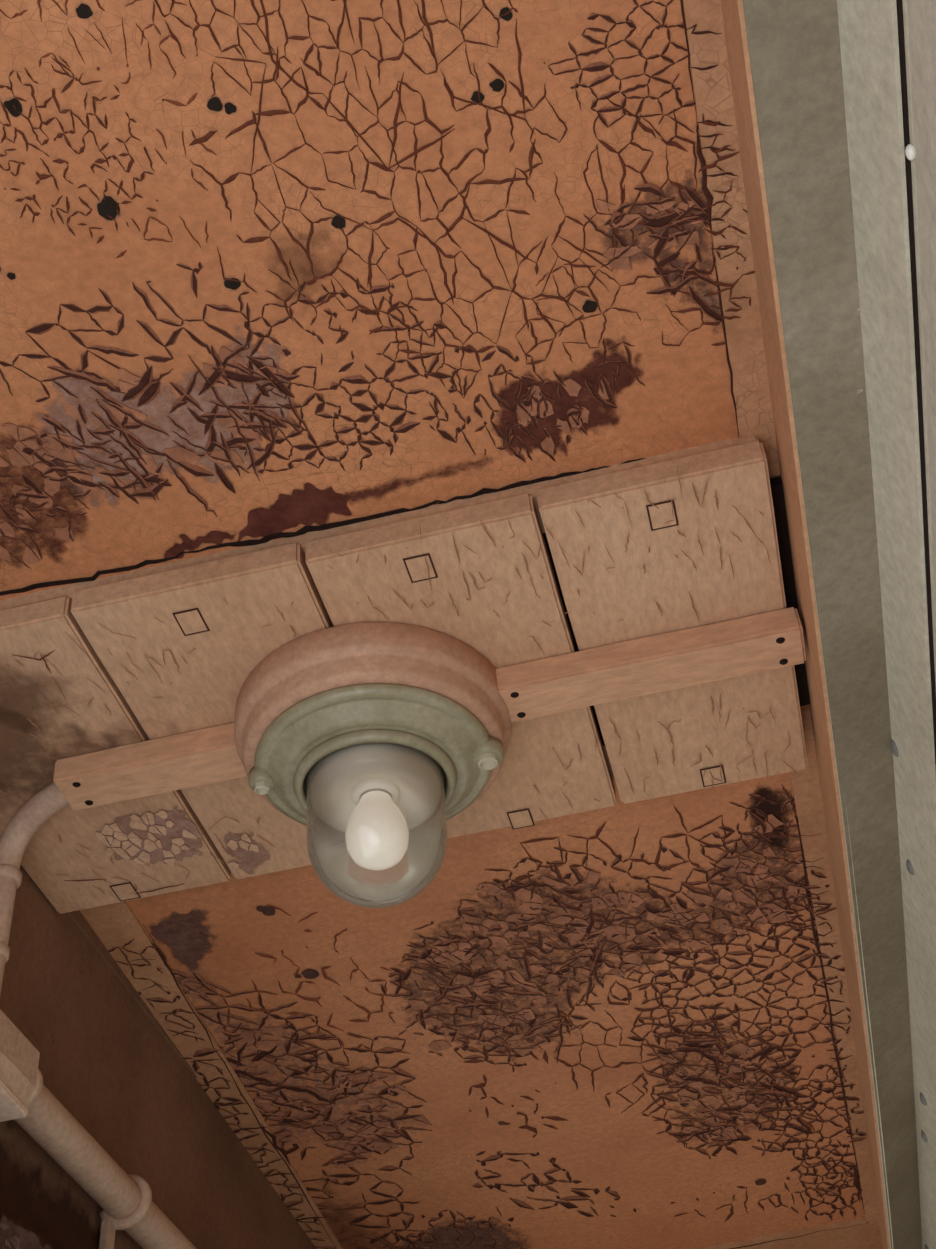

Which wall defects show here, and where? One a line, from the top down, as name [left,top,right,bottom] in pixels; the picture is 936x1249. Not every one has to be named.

peeling [582,179,722,322]
peeling [0,327,308,568]
peeling [497,339,645,461]
crack [0,617,196,738]
crack [55,817,275,895]
crack [108,696,869,1249]
peeling [388,784,816,1062]
peeling [171,969,429,1168]
peeling [646,1015,808,1150]
peeling [0,1216,52,1249]